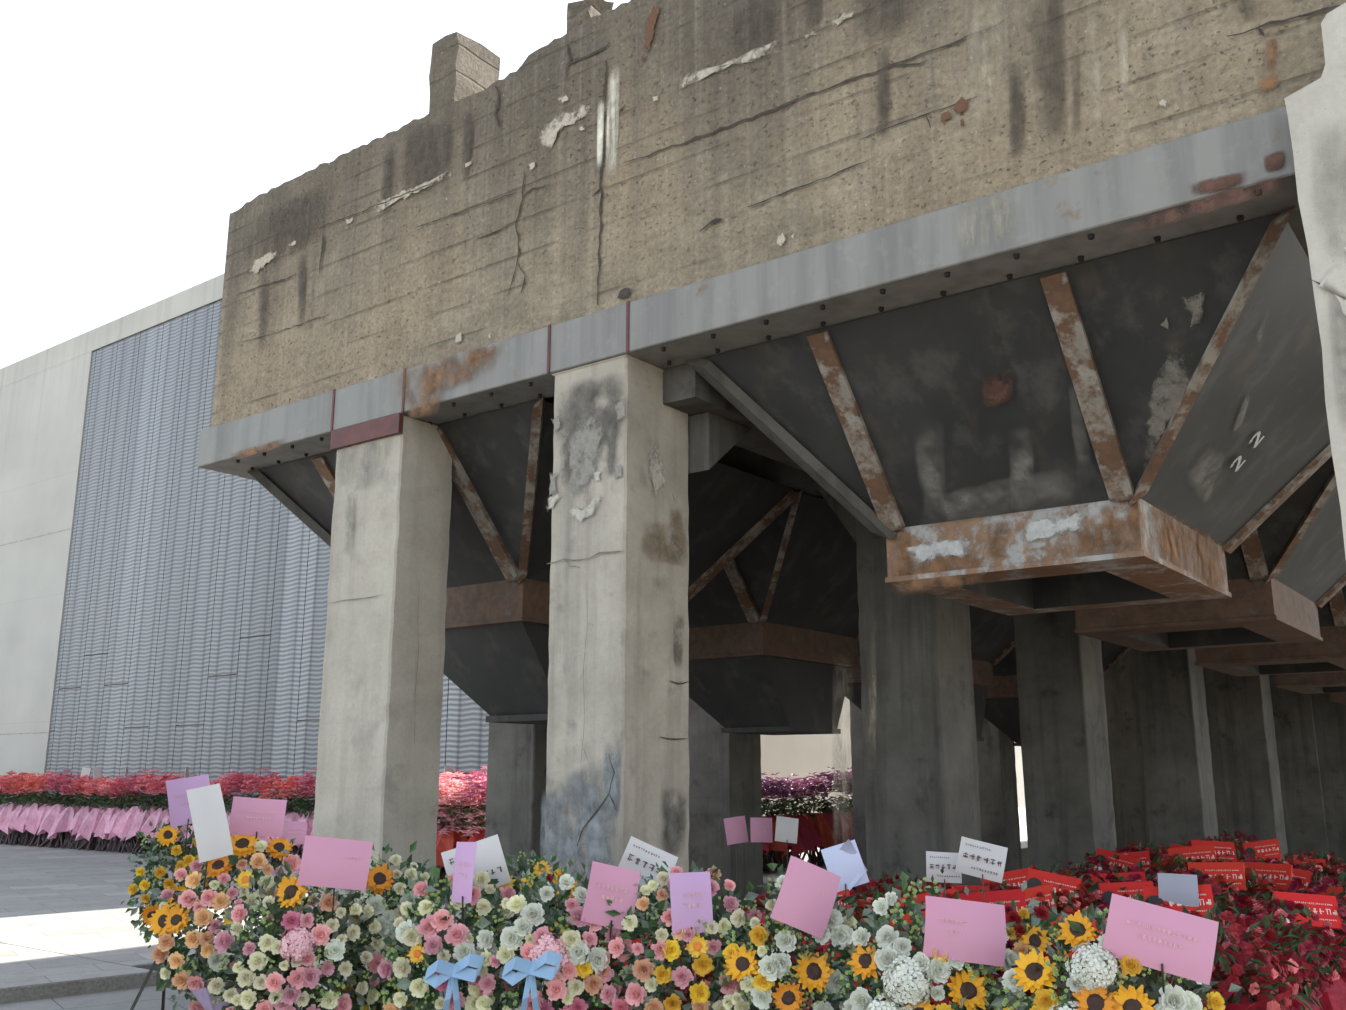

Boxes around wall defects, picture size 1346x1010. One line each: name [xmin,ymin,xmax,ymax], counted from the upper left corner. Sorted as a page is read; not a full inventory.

peeling [681,40,776,88]
damp [382,133,448,201]
damp [463,117,472,172]
spalling [540,95,588,147]
crack [566,17,1009,305]
damp [256,198,321,317]
crack [236,181,437,296]
crack [417,173,548,294]
corrosion [404,349,490,416]
peeling [548,398,625,522]
corrosion [898,535,978,590]
corrosion [1070,503,1141,556]